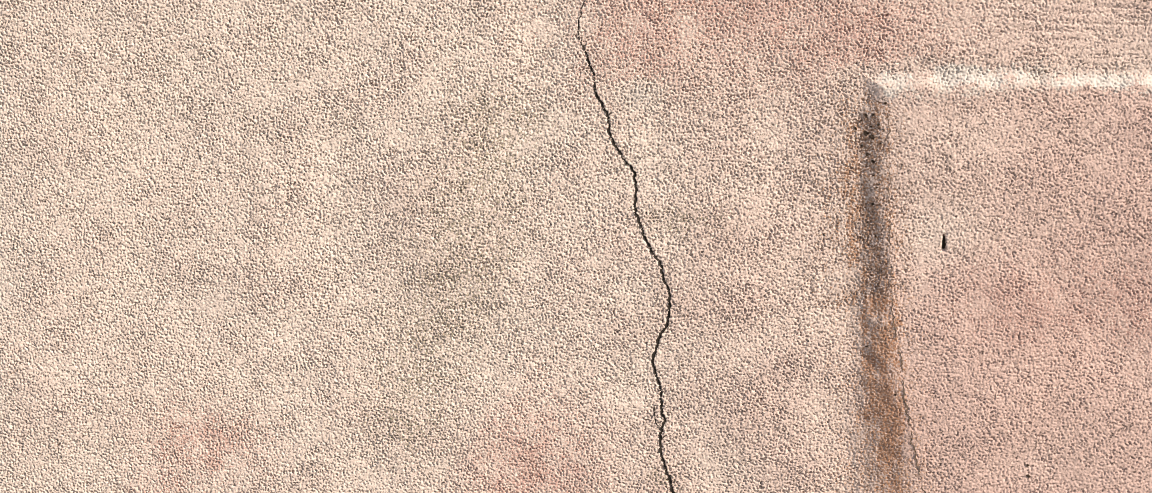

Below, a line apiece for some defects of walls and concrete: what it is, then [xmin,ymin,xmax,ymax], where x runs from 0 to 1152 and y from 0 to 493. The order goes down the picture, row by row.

crack [578,0,675,493]